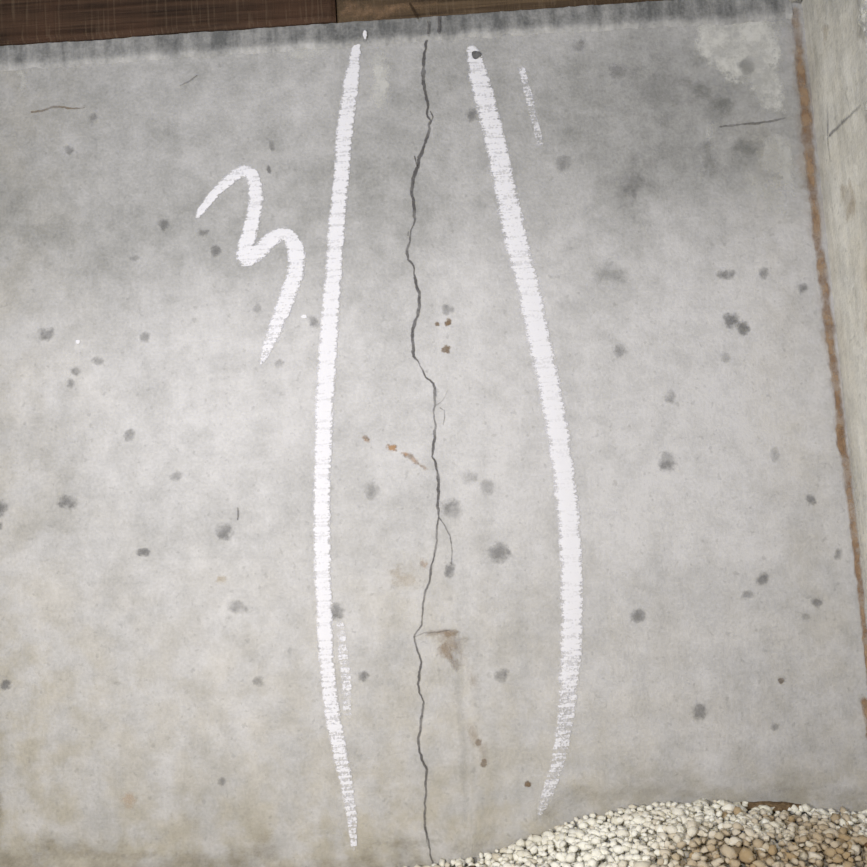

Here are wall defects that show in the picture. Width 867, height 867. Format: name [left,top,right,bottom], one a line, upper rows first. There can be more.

crack [406,3,440,394]
corrosion [796,51,867,668]
crack [413,417,452,863]